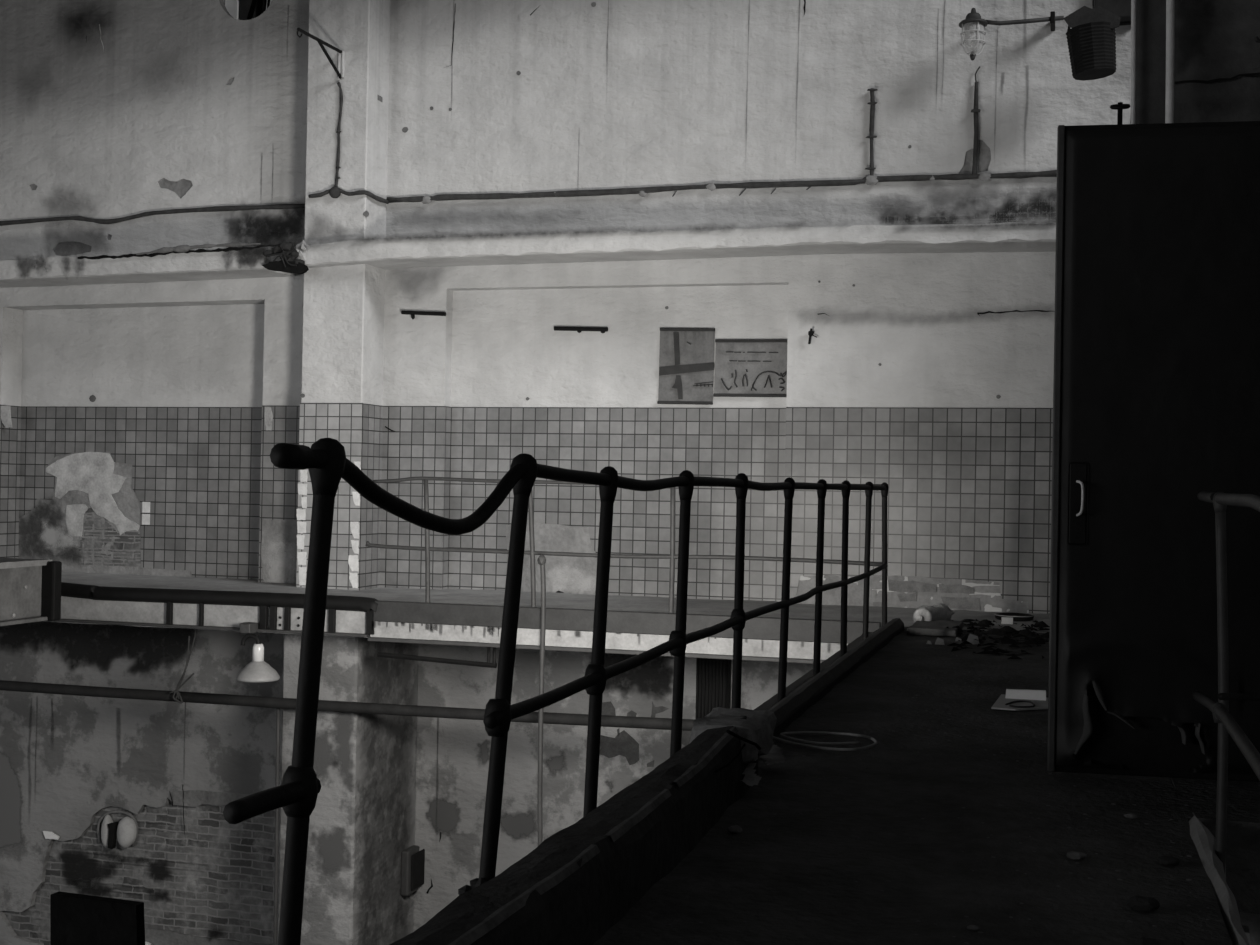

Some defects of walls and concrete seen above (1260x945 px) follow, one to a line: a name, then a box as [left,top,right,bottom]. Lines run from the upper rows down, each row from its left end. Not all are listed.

spalling [158,178,193,198]
damp [229,208,305,265]
damp [883,214,976,225]
damp [992,194,1056,223]
peeling [19,452,192,577]
damp [0,621,195,673]
flaking render [4,790,275,945]